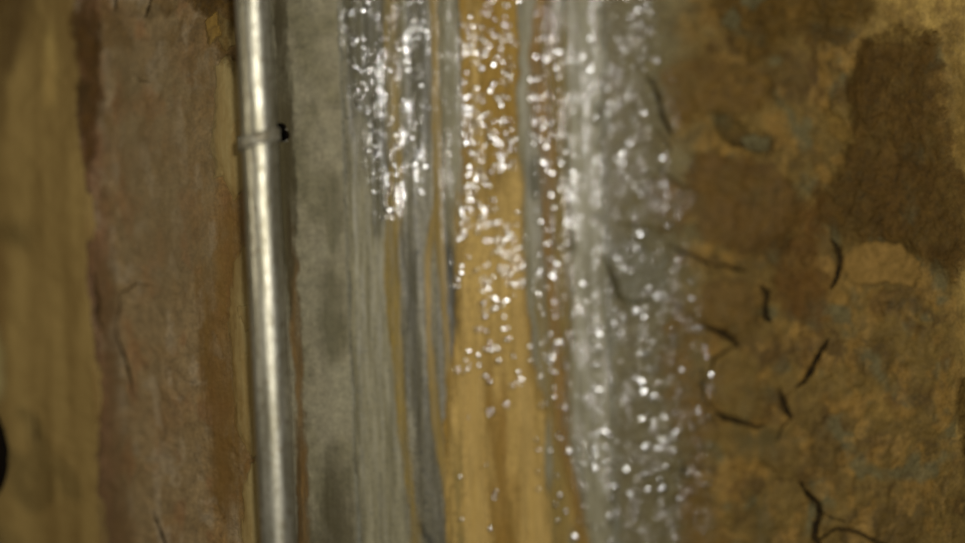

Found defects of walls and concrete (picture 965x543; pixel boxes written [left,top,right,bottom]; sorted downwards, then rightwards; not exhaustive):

crack [648,80,672,151]
water stain [323,0,465,543]
corrosion [425,0,588,543]
water stain [515,0,706,543]
crack [607,265,653,304]
crack [627,225,772,322]
crack [830,240,843,288]
crack [700,326,829,440]
crack [800,482,881,543]